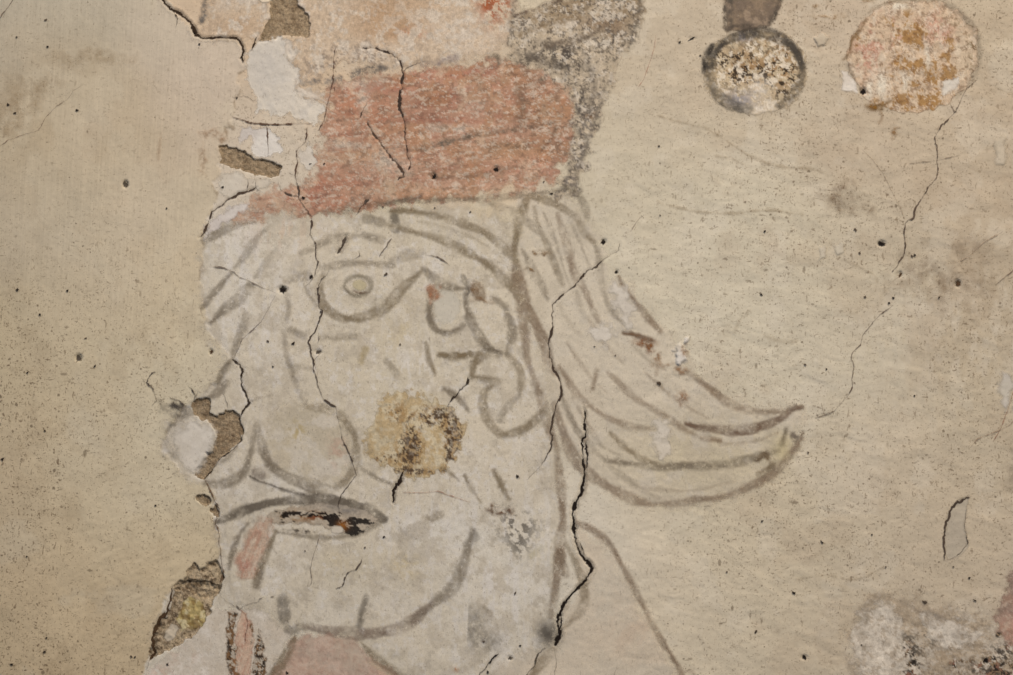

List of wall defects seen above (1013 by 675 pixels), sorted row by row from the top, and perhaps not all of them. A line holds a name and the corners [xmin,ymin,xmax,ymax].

peeling [204,0,327,237]
crack [360,47,413,180]
peeling [842,71,866,95]
peeling [942,77,959,95]
crack [233,50,391,407]
crack [543,261,602,462]
spalling [195,494,220,517]
spalling [174,397,244,479]
crack [338,436,357,507]
crack [526,411,594,675]
peeling [942,496,969,567]
spalling [149,560,225,665]